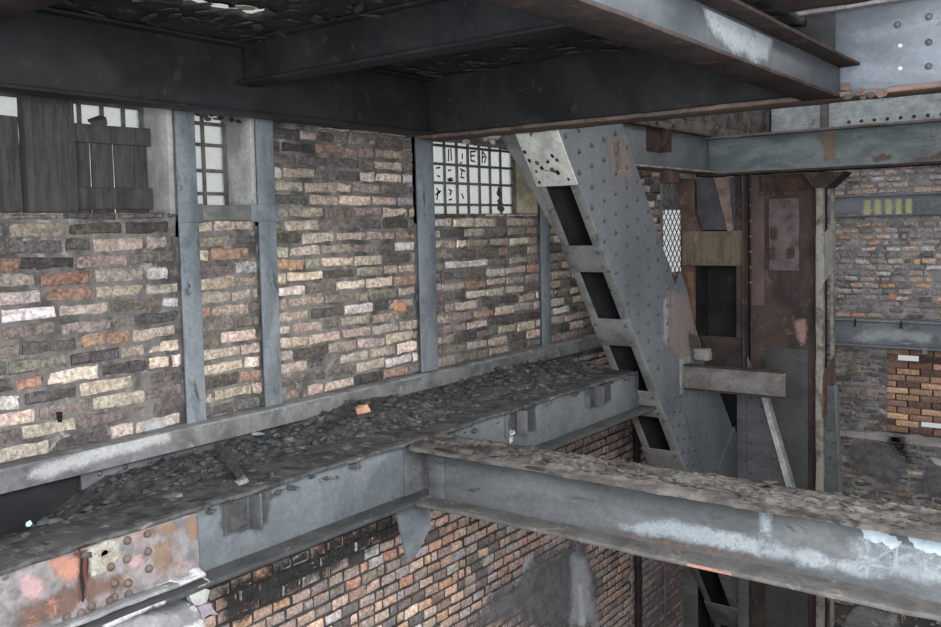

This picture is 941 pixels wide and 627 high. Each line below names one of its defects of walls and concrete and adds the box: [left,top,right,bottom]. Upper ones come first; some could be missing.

rust [152,515,198,573]
peeling [858,529,941,570]
rust [17,556,124,627]
water stain [569,554,600,627]